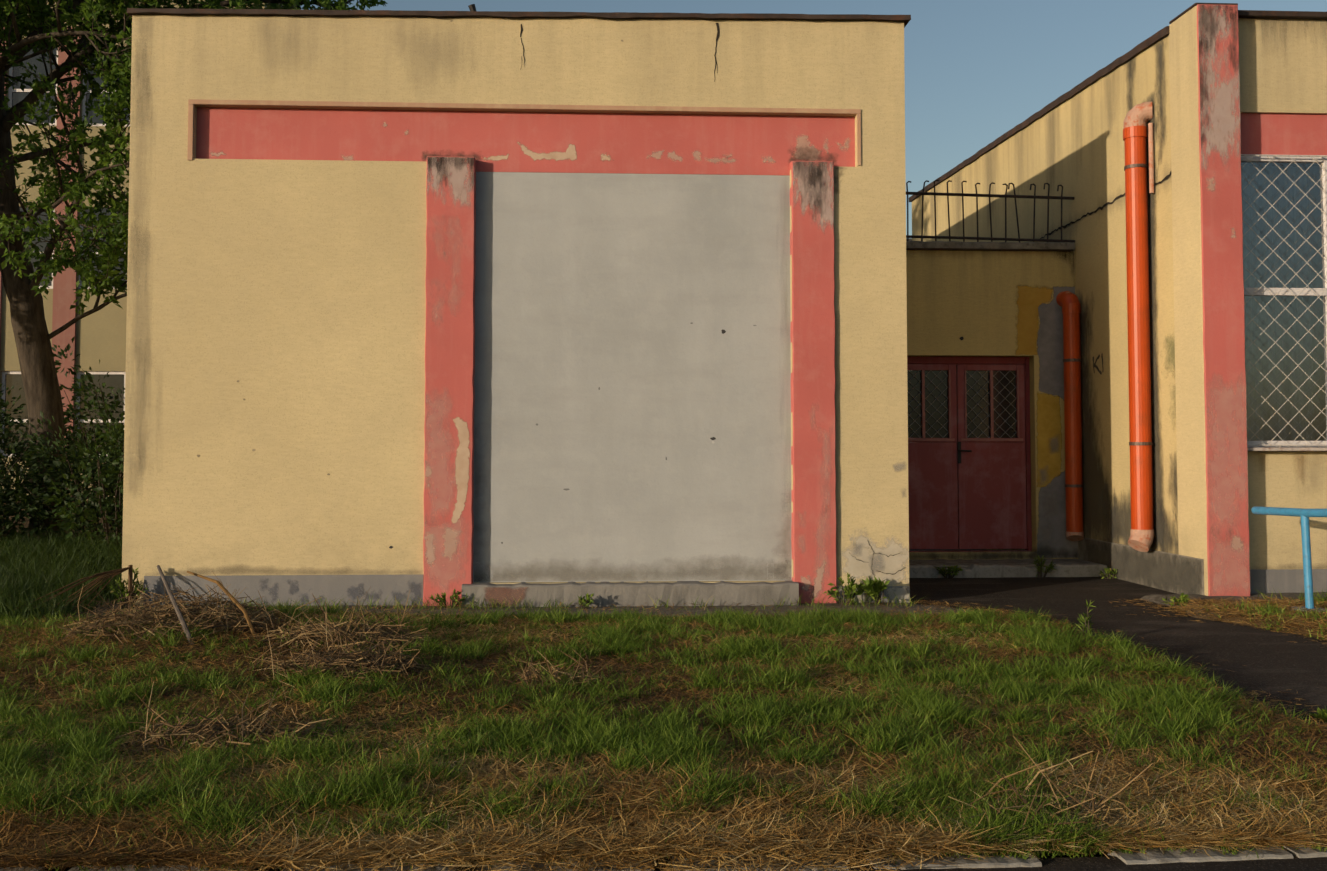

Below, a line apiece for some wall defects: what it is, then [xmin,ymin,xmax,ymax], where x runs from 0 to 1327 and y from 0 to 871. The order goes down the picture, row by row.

crack [713,23,721,82]
peeling [484,142,577,161]
peeling [650,151,735,163]
peeling [424,417,470,564]